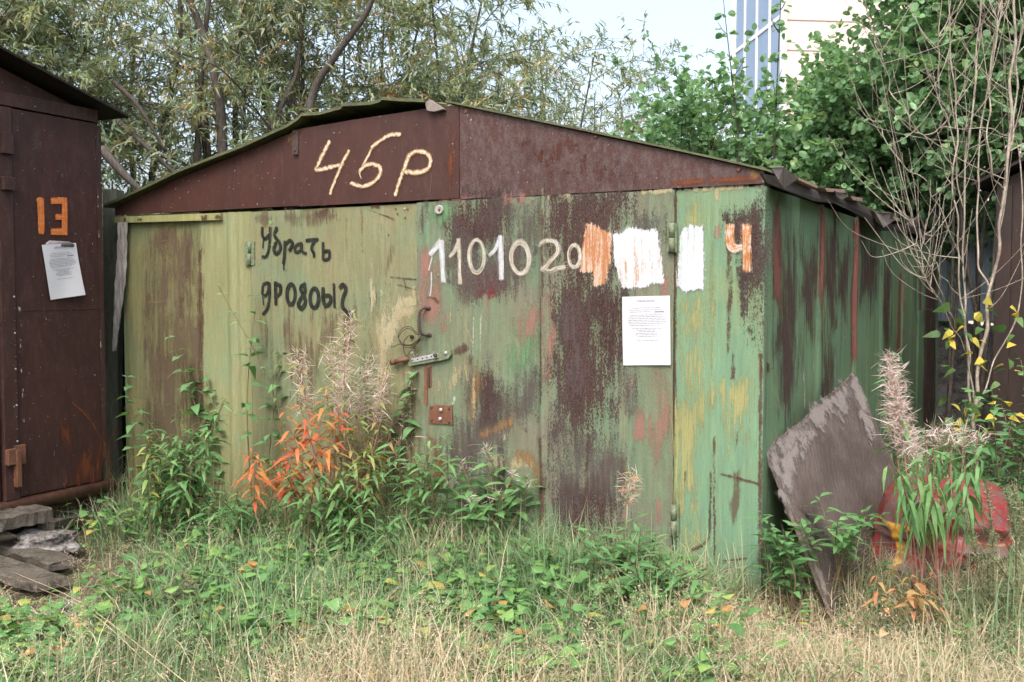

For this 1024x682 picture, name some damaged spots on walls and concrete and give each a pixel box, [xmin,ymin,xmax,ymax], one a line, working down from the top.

rust [196,249,204,404]
rust [454,342,483,421]
rust [471,266,505,314]
peeling [369,137,848,570]
rust [671,170,892,569]
rust [922,261,936,435]
rust [538,438,546,534]